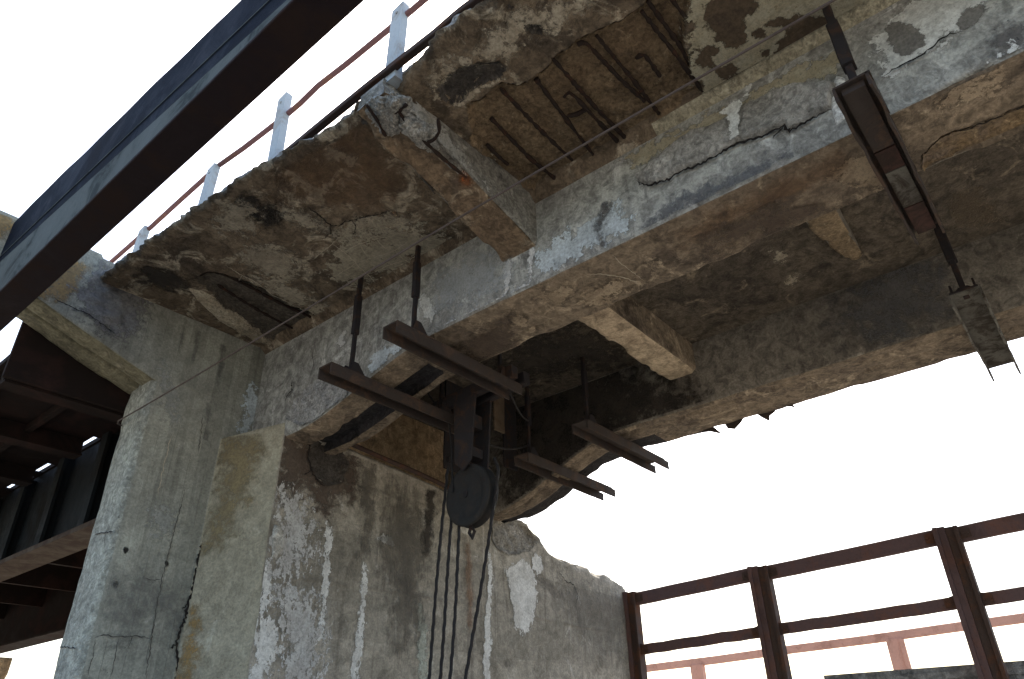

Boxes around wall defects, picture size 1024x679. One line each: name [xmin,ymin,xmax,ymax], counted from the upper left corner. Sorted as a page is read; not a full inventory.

spalling [422,118,468,179]
leakage [453,77,506,107]
leakage [426,0,593,92]
spalling [436,0,867,190]
crack [638,109,832,186]
crack [923,107,1023,155]
leakage [211,190,452,315]
spalling [189,272,314,343]
crack [60,439,204,679]
leakage [248,435,436,679]
spalling [492,522,538,556]
leakage [482,552,544,679]